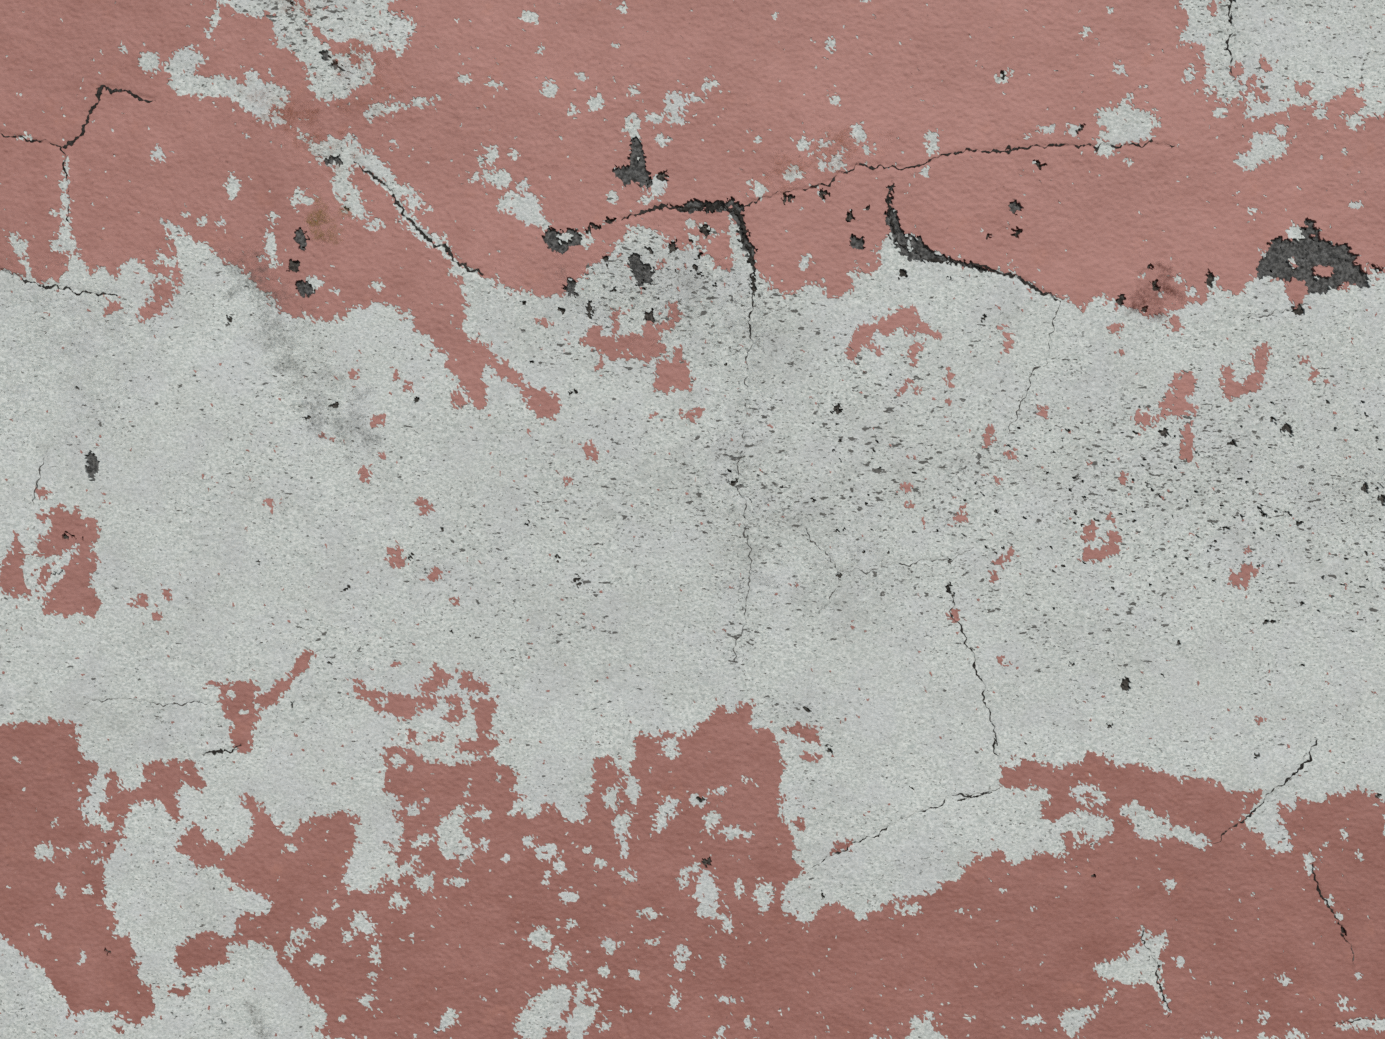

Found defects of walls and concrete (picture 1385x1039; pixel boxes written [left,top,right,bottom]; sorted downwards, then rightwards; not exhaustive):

crack [1,85,153,223]
peeling [222,171,252,201]
crack [353,161,483,275]
spalling [980,194,1026,240]
peeling [1023,60,1162,167]
peeling [1148,0,1385,172]
crack [1,268,118,296]
crack [806,528,998,755]
crack [812,788,999,868]
crack [1213,739,1318,844]
peeling [558,886,580,905]
peeling [341,909,392,1018]